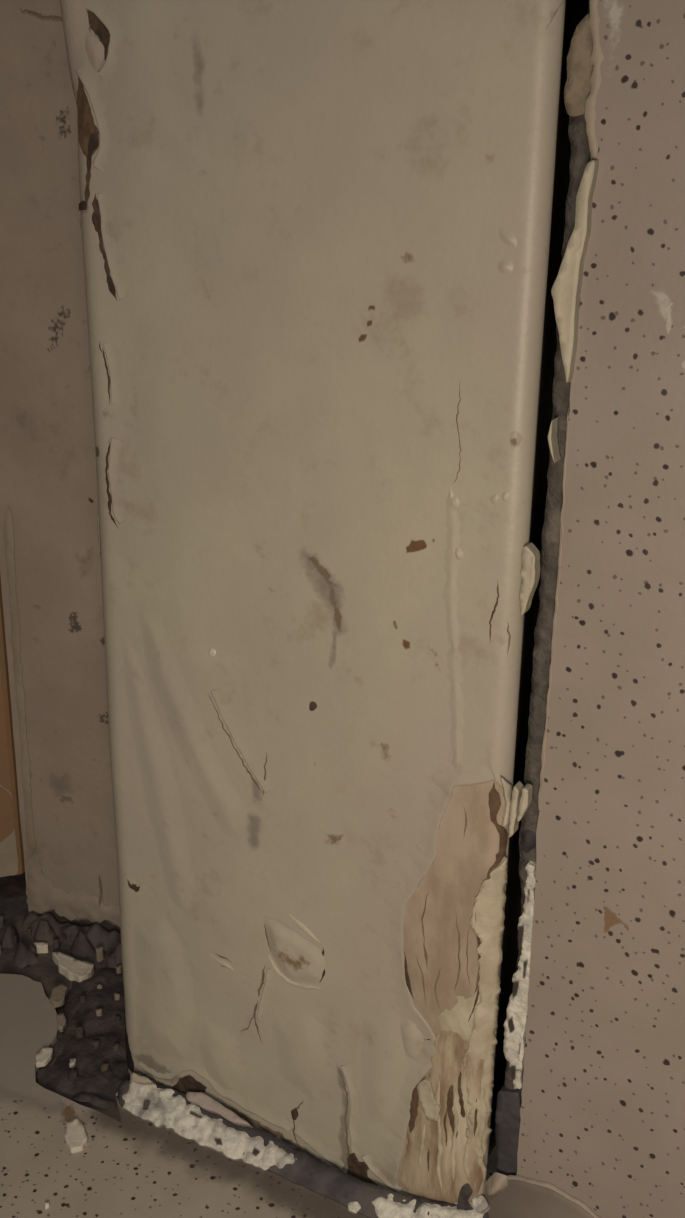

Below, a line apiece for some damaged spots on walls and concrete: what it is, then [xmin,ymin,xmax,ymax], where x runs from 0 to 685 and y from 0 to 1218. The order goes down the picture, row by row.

crack [92,193,127,300]
peeling [551,160,599,383]
crack [99,343,119,405]
crack [95,437,127,555]
peeling [34,942,49,953]
spalling [130,757,533,1211]
damp [102,1108,369,1218]